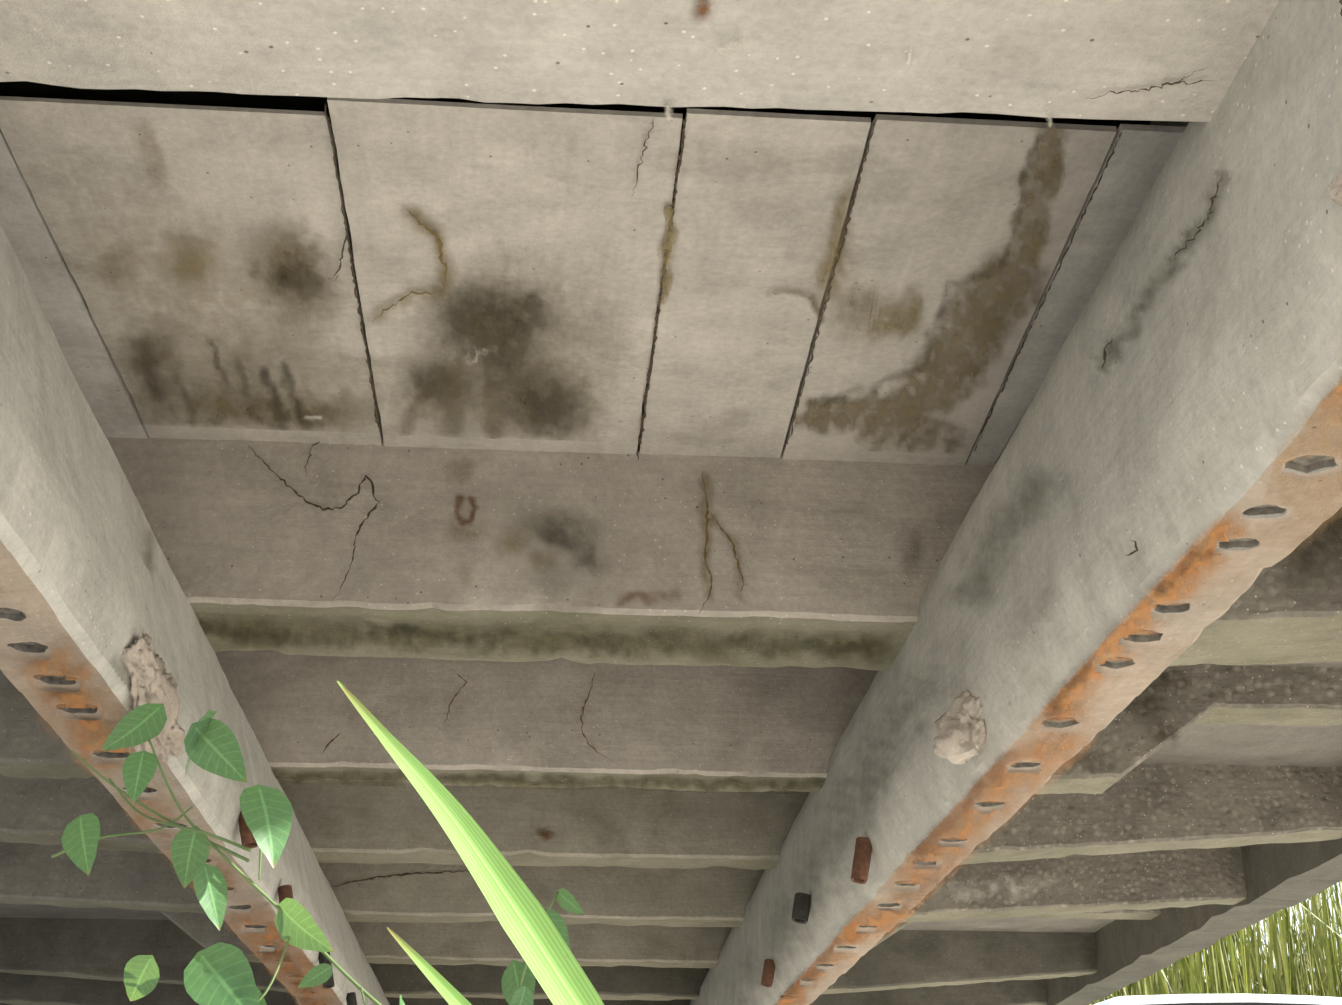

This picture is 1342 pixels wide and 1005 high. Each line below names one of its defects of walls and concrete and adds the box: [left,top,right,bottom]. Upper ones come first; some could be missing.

crack [1085,67,1211,99]
damp [267,237,322,308]
crack [633,118,687,460]
crack [787,123,876,444]
damp [795,116,1063,451]
damp [135,342,339,428]
damp [417,293,574,427]
crack [250,442,380,599]
rust [455,496,476,536]
rust [32,653,129,767]
rust [778,522,1240,1005]
rust [242,919,330,1005]